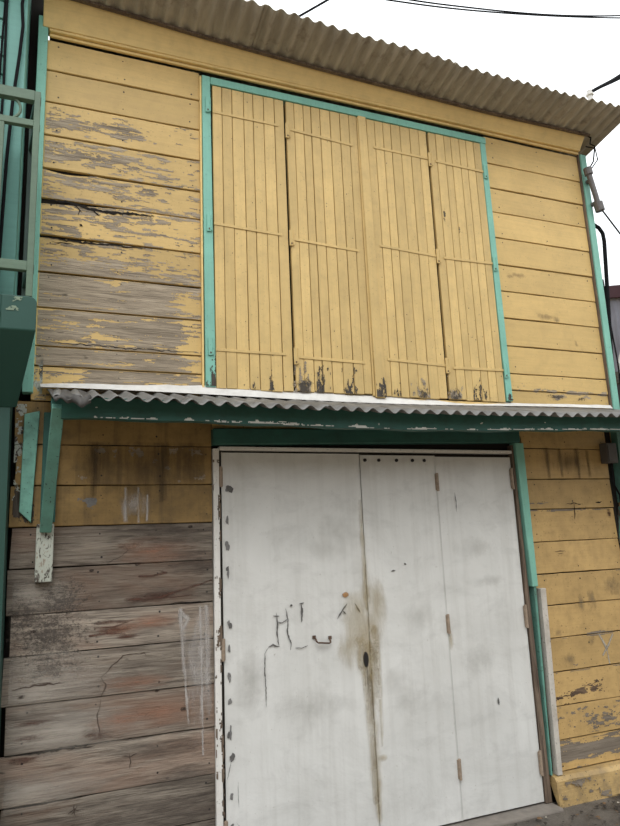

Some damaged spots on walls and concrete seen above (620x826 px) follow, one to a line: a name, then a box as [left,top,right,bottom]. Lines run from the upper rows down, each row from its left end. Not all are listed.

crack [44,199,153,249]
peeling [12,107,209,500]
peeling [467,422,620,430]
crack [12,652,147,756]
peeling [556,664,620,768]
peeling [561,777,612,808]